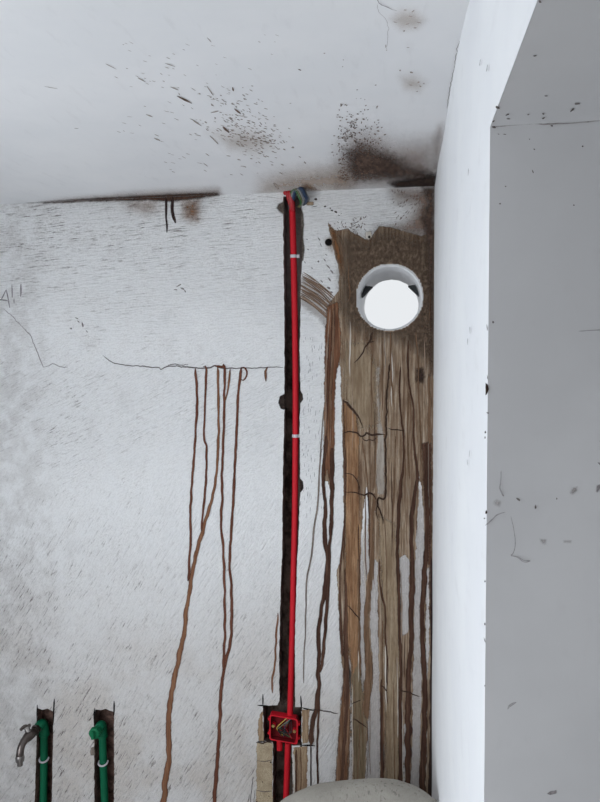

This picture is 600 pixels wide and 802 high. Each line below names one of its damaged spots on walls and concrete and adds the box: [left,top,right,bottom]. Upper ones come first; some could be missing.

water stain [190,83,294,175]
water stain [44,193,219,232]
crack [4,309,66,368]
crack [105,357,283,370]
crack [354,332,374,363]
water stain [274,89,436,797]
crack [343,364,405,522]
corrosion [160,364,248,802]